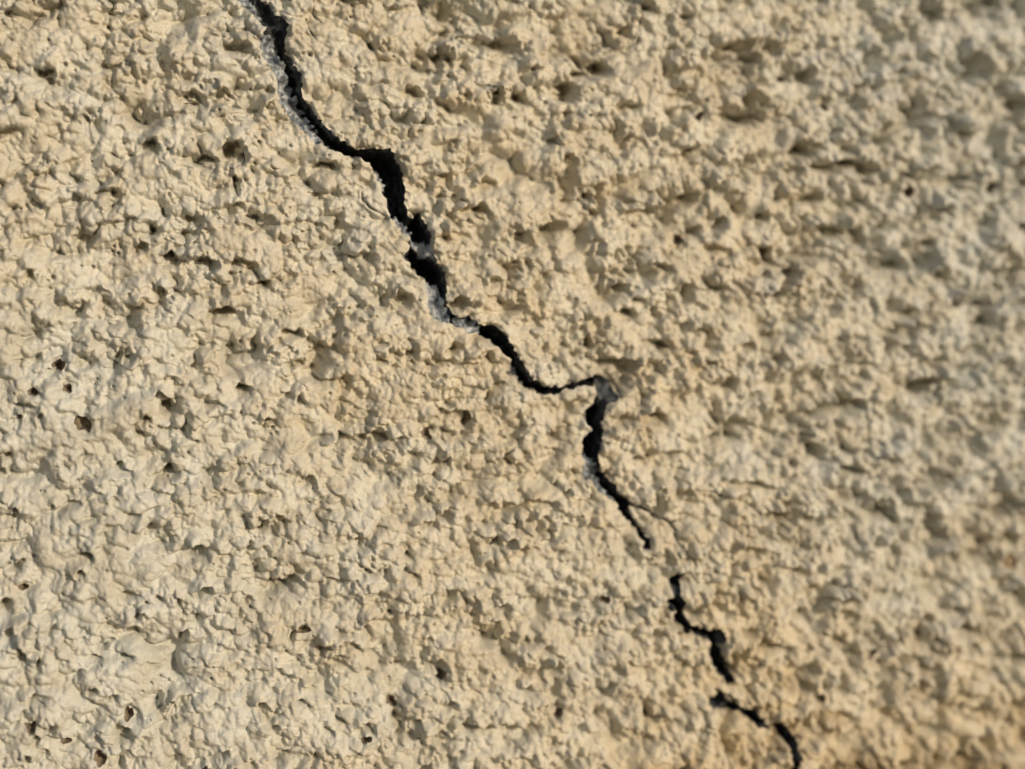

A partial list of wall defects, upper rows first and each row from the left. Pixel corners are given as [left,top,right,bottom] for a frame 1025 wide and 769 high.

crack [238,0,804,769]